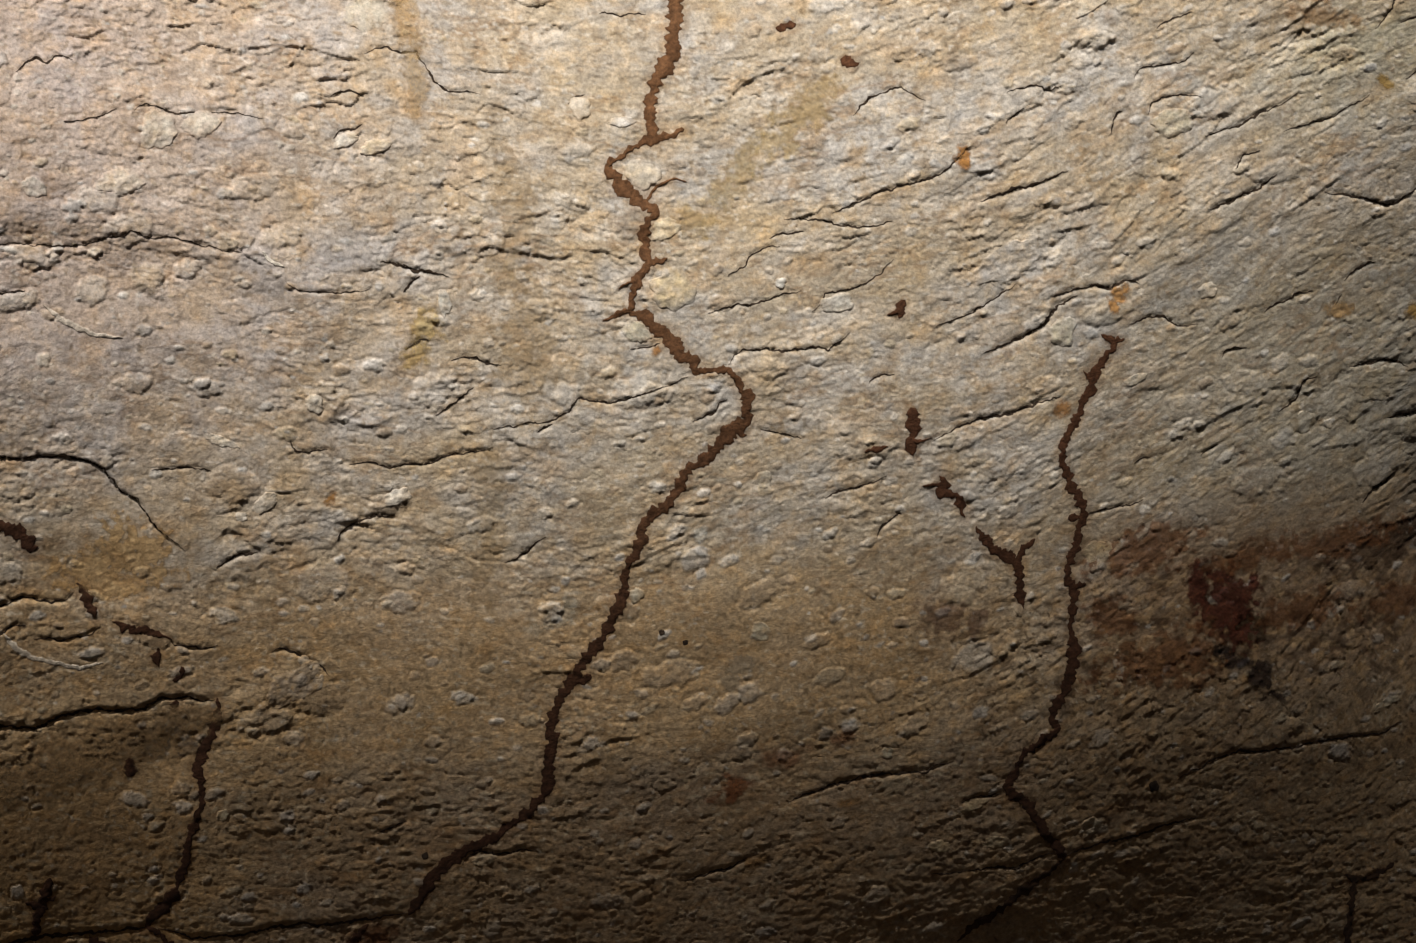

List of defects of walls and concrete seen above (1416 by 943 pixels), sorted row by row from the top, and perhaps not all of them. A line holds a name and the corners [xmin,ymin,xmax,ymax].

crack [599,10,646,18]
crack [405,338,501,415]
crack [290,377,687,469]
crack [0,453,211,551]
crack [216,552,256,568]
crack [507,537,545,562]
crack [0,695,215,730]
crack [462,848,539,864]